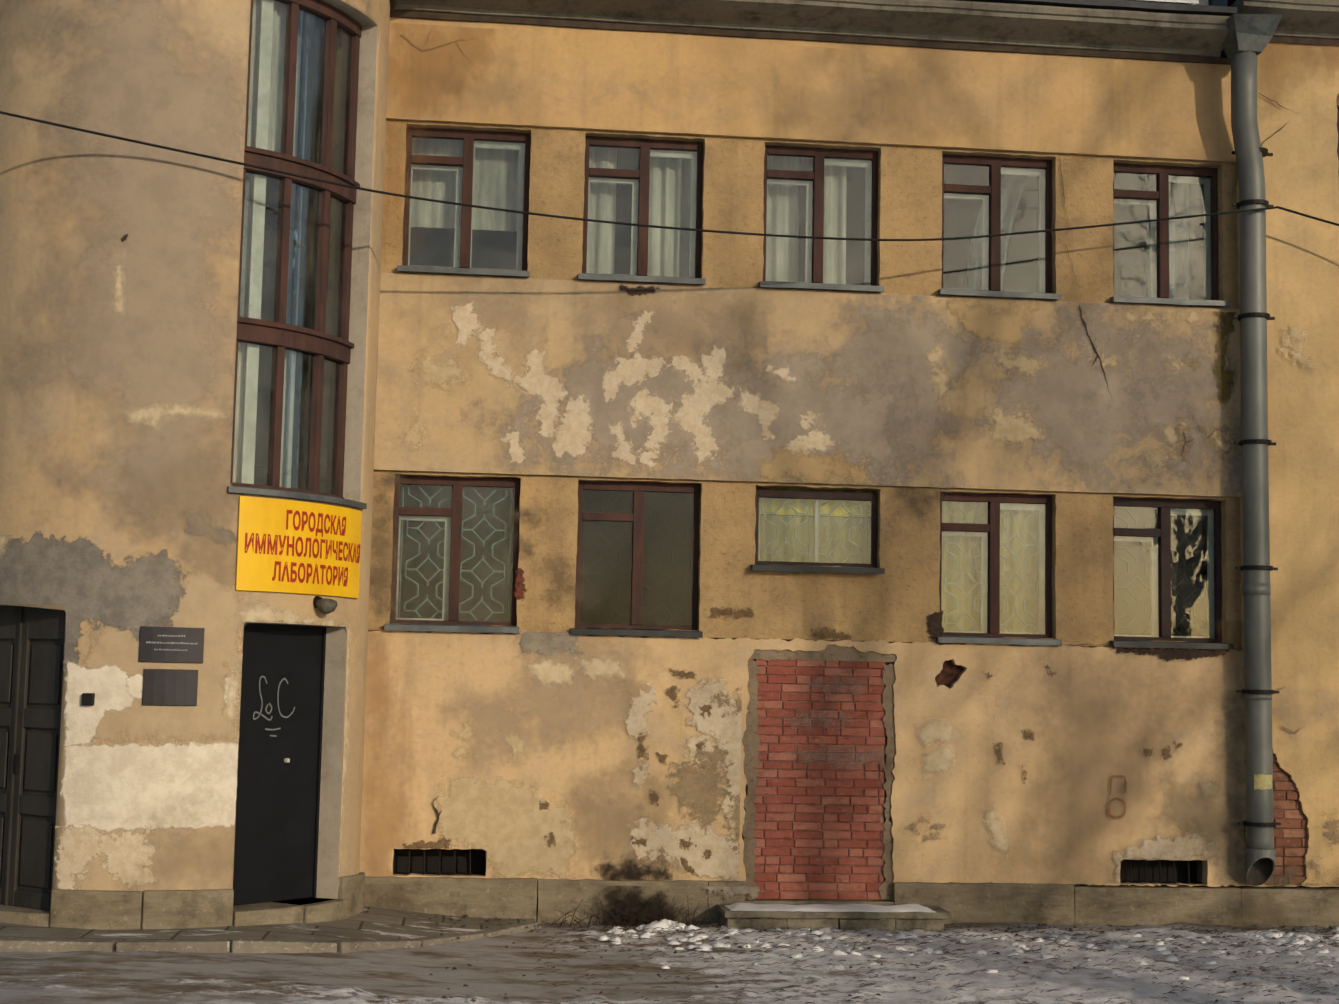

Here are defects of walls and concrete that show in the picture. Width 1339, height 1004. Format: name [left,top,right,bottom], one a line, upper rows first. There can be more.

leakage [113,254,125,313]
crack [1059,158,1113,401]
peeling [451,285,835,469]
peeling [64,661,143,747]
peeling [55,824,160,890]
peeling [223,667,240,720]
peeling [238,604,350,840]
peeling [528,657,626,686]
peeling [621,668,761,900]
spalling [935,660,964,688]
spalling [1144,741,1183,760]
flaking render [1263,754,1339,885]